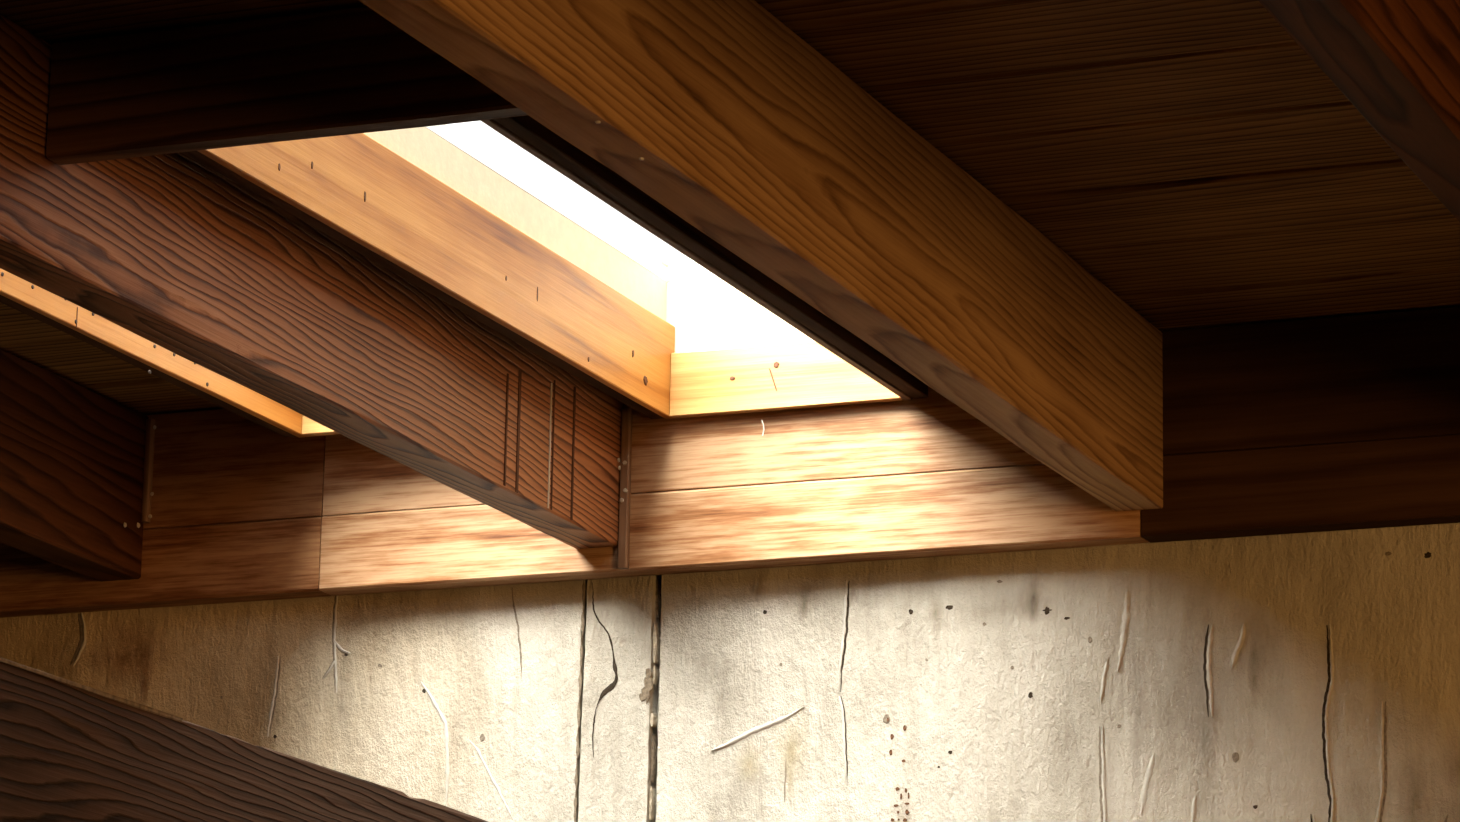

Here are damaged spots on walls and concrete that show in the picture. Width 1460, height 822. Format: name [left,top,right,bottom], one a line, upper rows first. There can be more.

crack [592,582,618,758]
crack [1203,624,1213,717]
crack [1310,624,1335,822]
crack [1375,701,1387,822]